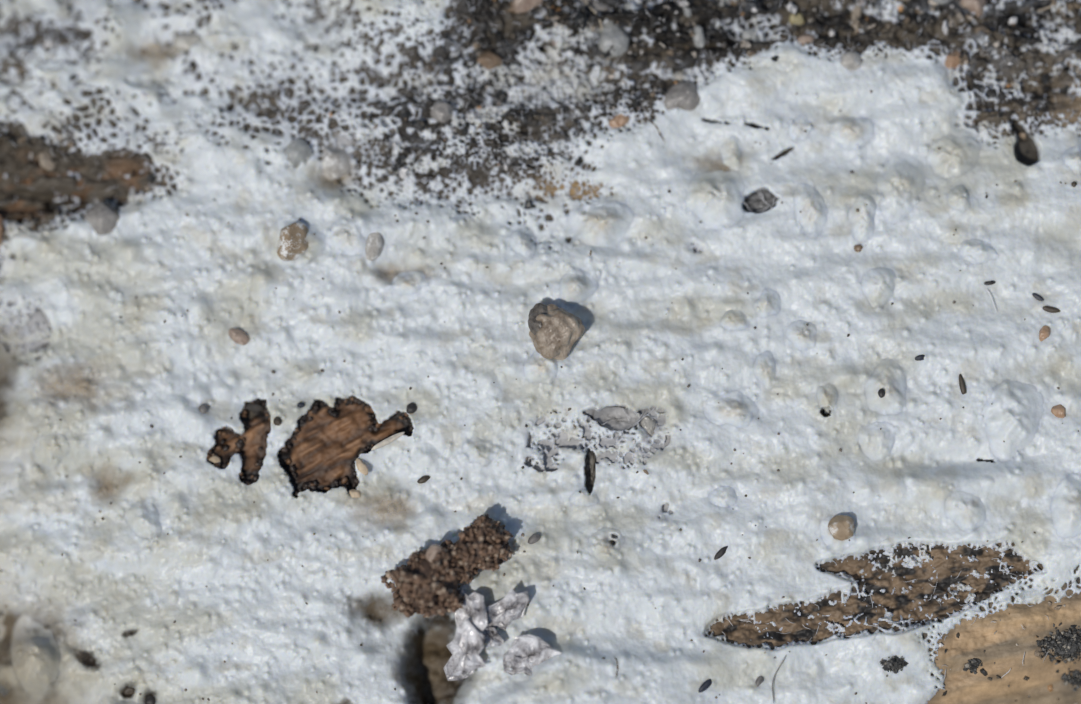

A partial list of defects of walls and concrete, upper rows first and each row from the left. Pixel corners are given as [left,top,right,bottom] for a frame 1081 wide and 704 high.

peeling [206,394,414,498]
water stain [373,499,409,521]
water stain [357,598,403,623]
water stain [0,615,18,661]
water stain [405,627,450,700]